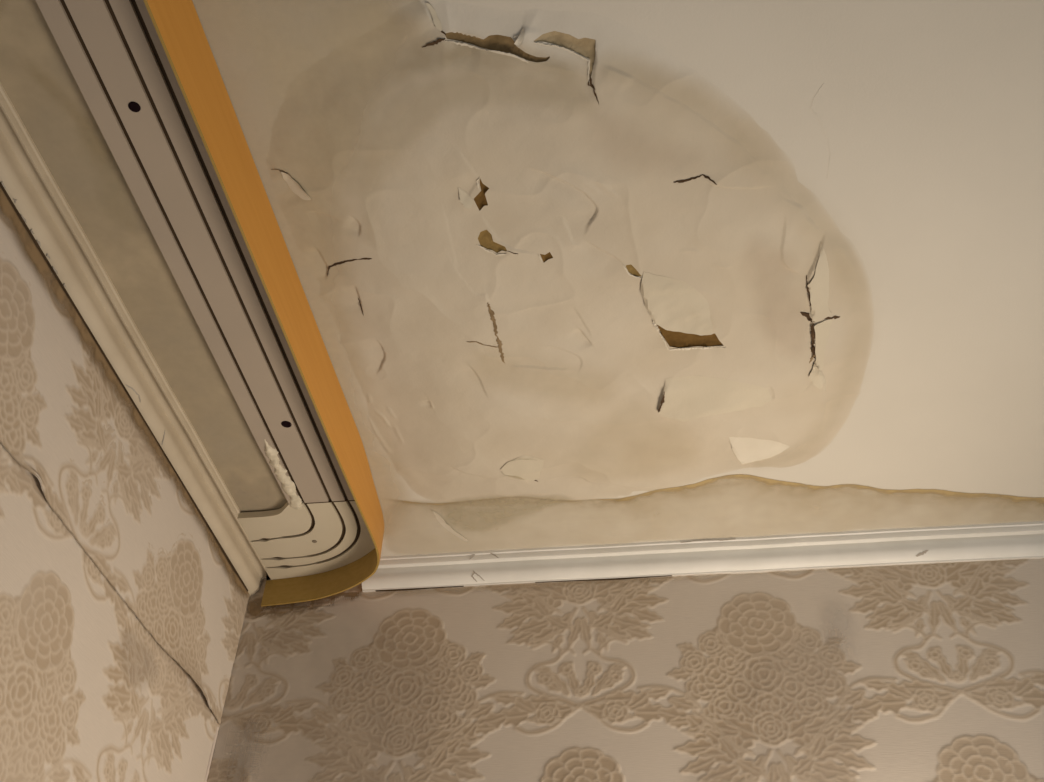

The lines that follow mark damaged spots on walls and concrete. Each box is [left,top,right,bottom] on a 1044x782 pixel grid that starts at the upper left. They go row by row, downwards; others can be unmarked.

crack [0,182,248,592]
water stain [0,187,360,617]
water stain [192,0,402,472]
crack [467,303,505,363]
water stain [595,474,1044,504]
crack [800,275,840,363]